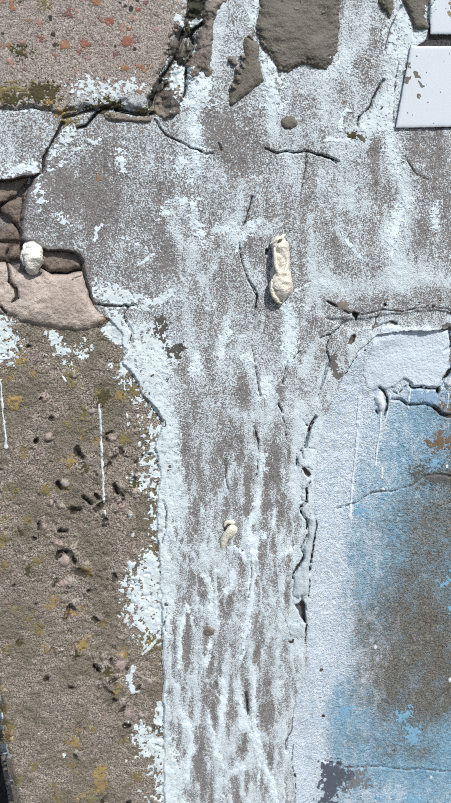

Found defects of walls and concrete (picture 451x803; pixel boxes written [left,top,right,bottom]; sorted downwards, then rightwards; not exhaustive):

crack [42,0,222,173]
peeling [394,55,429,103]
water stain [154,99,269,253]
crack [265,148,338,196]
spalling [0,177,32,260]
spalling [41,250,87,272]
crack [375,368,451,418]
water stain [234,449,276,663]
crack [292,482,318,597]
water stain [175,604,194,670]
water stain [205,674,279,803]
water stain [313,755,380,803]